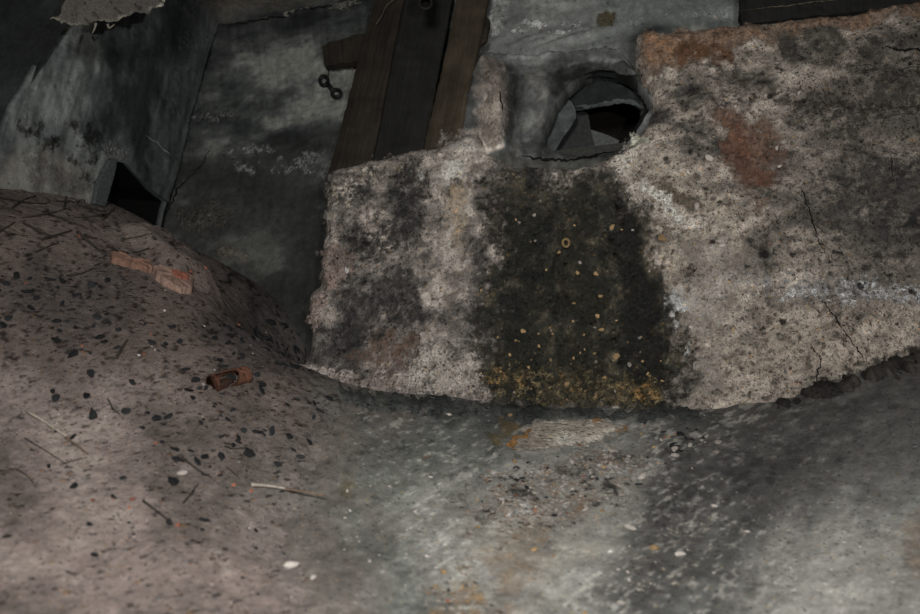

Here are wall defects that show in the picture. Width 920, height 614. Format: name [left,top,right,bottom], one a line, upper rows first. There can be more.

corrosion [711,108,787,188]
leakage [227,129,920,410]
crack [817,289,867,362]